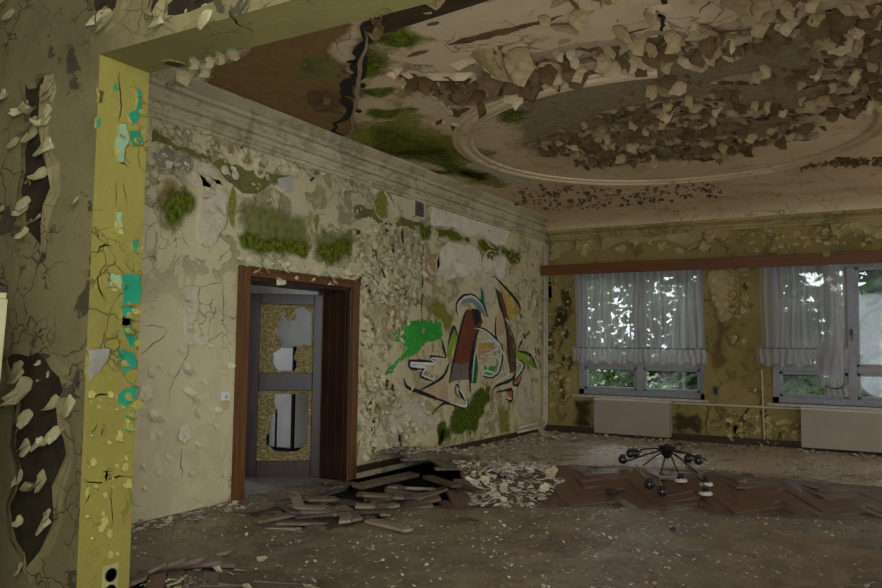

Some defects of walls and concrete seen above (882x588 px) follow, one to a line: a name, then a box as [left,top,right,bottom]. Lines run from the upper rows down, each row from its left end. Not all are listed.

crack [515,15,563,27]
crack [629,0,668,37]
peeling [160,48,240,87]
peeling [385,0,882,172]
peeling [113,88,722,465]
peeling [704,268,752,325]
peeling [84,271,209,444]
water stain [575,401,590,426]
mould [673,412,703,434]
peeling [724,407,801,446]
peeling [0,340,76,584]
peeling [85,455,162,498]